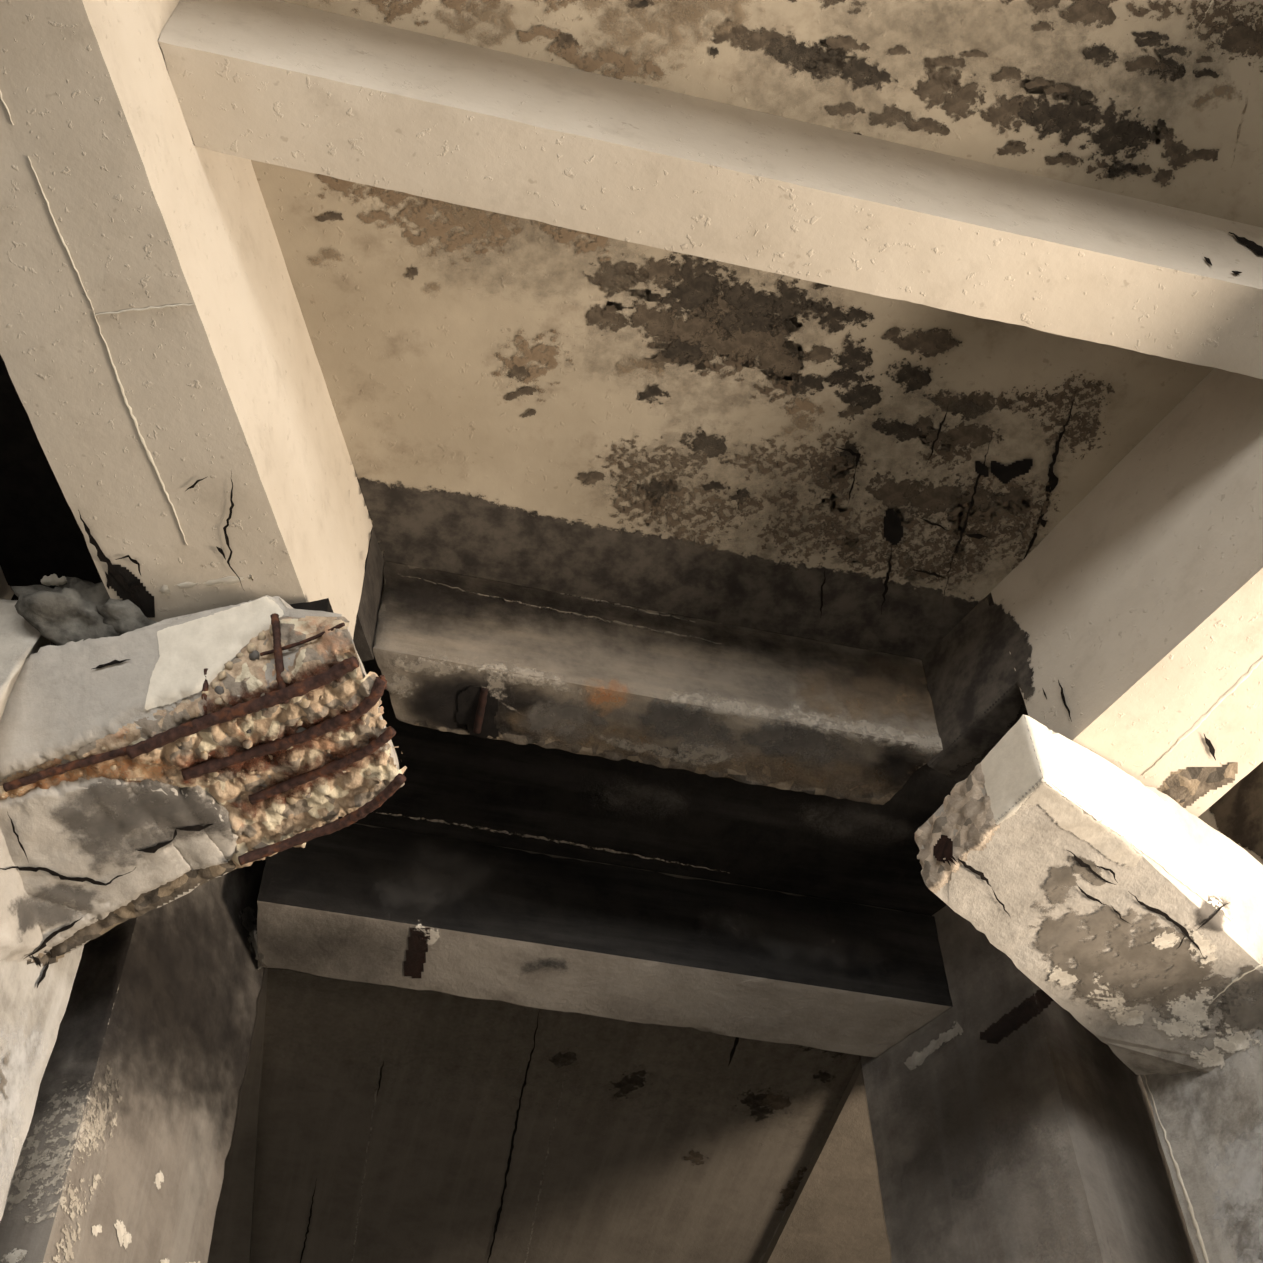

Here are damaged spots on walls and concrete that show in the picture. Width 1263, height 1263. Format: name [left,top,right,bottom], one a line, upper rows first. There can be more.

crack [78,510,155,618]
rust [205,657,342,725]
damp [356,476,1035,794]
crack [24,917,83,988]
crack [0,812,213,886]
rust [0,704,386,817]
spalling [0,613,407,966]
spalling [914,763,1000,893]
peeling [1028,856,1263,1069]
crack [1067,850,1230,959]
spalling [1158,762,1238,808]
peeling [0,1064,132,1263]